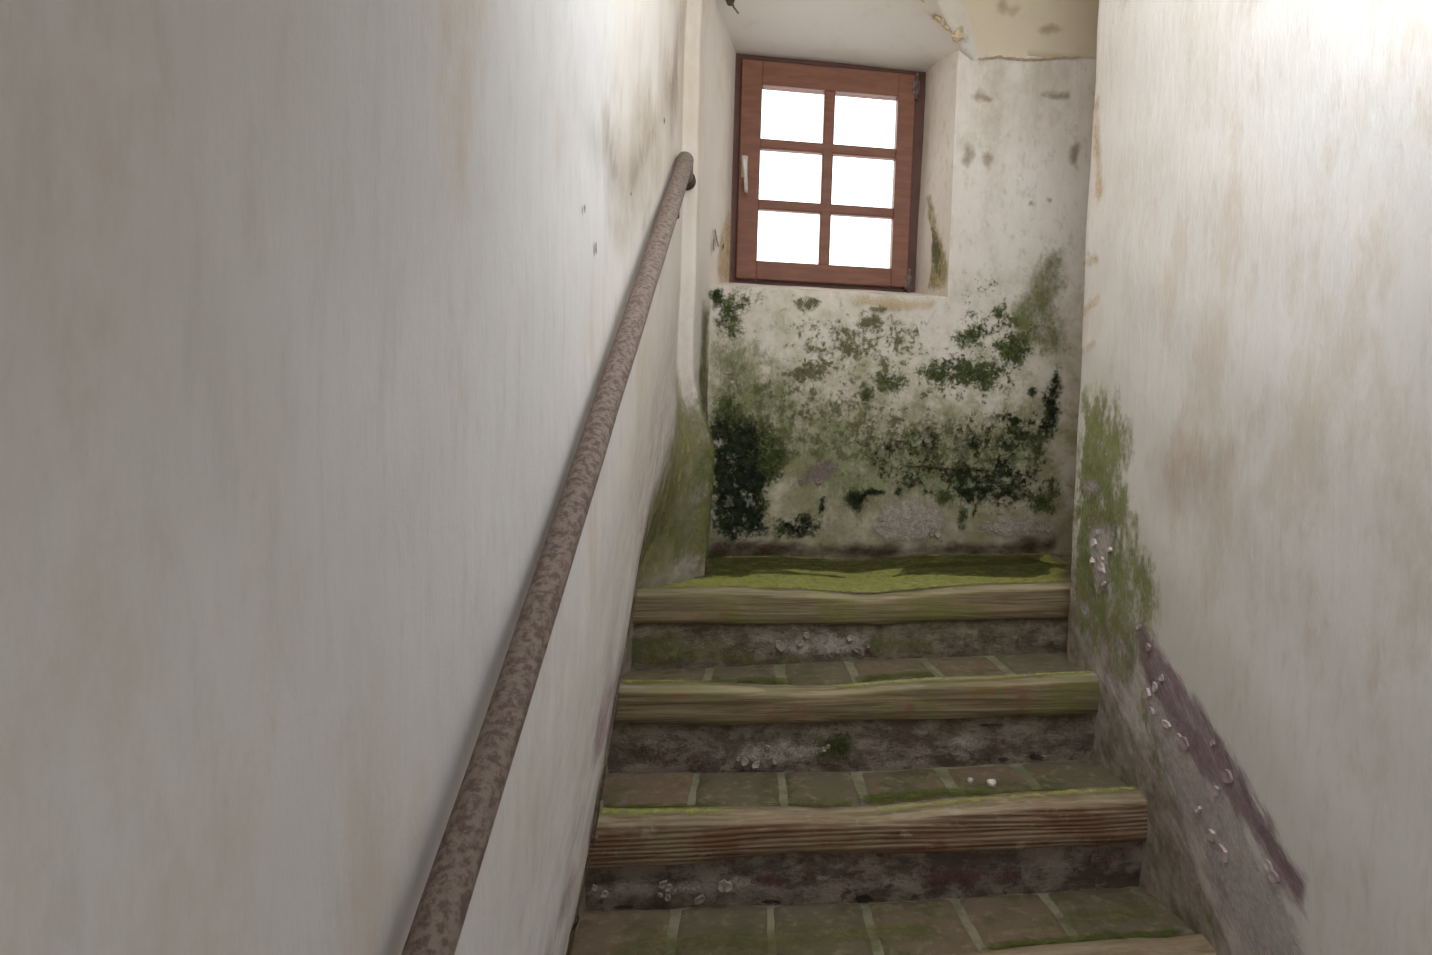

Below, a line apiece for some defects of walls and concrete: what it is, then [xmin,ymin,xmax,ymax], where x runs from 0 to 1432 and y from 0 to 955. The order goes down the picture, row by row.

water stain [703,410,898,558]
water stain [936,508,1054,554]
peeling [1089,524,1114,586]
peeling [1118,623,1303,903]